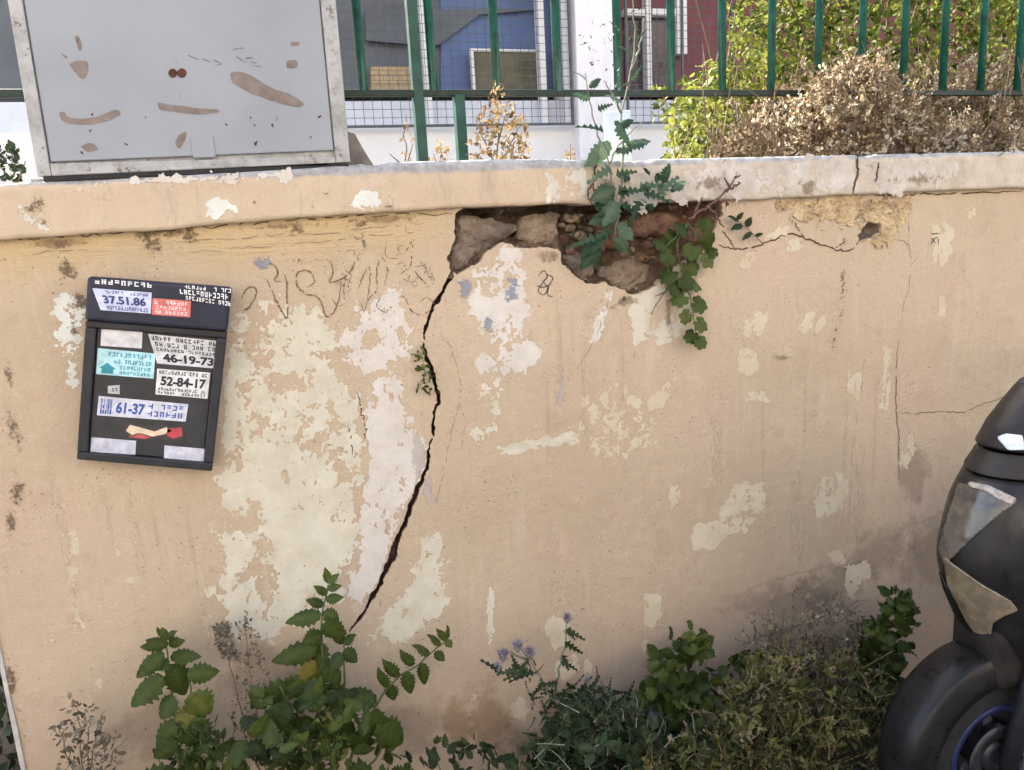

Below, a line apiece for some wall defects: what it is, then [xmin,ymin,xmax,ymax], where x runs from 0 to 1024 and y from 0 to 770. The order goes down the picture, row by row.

peeling [120,167,293,222]
crack [719,222,860,252]
crack [852,155,1023,196]
peeling [50,292,86,389]
peeling [447,153,964,459]
crack [885,230,1002,478]
peeling [204,284,428,645]
crack [342,273,466,647]
peeling [690,481,766,552]
peeling [367,532,451,647]